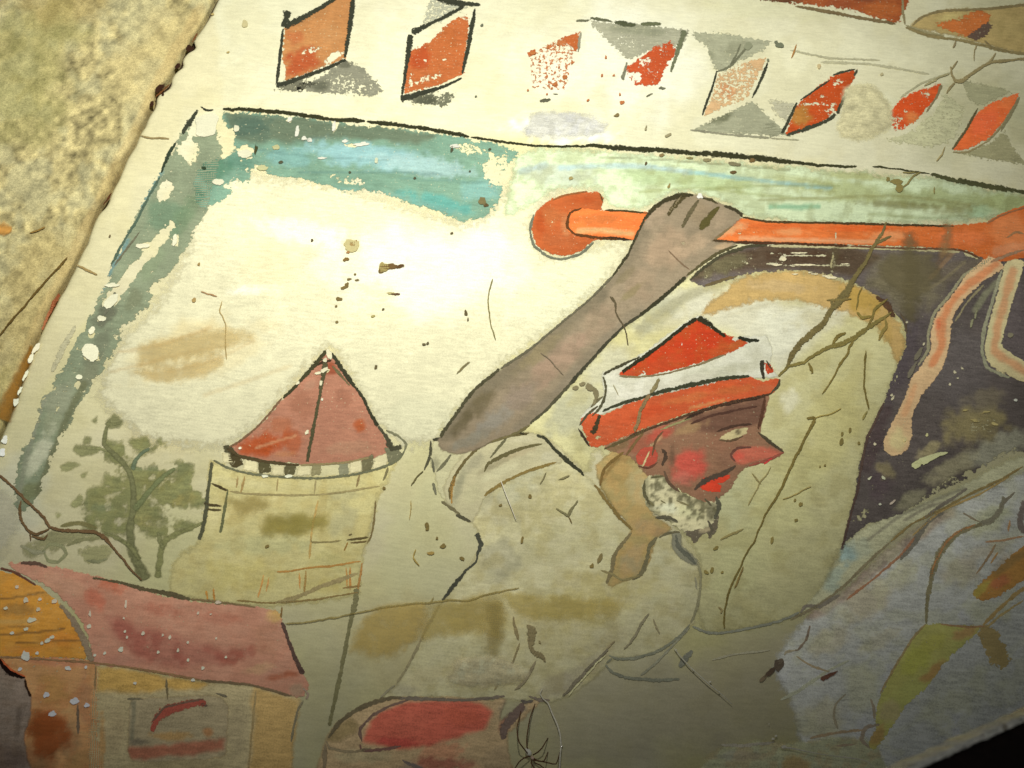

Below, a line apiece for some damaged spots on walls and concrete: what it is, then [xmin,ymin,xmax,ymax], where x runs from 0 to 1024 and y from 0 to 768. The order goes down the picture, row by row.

peeling [195,113,219,137]
peeling [237,145,283,170]
peeling [82,283,119,362]
peeling [13,343,40,406]
flaking render [0,658,31,768]